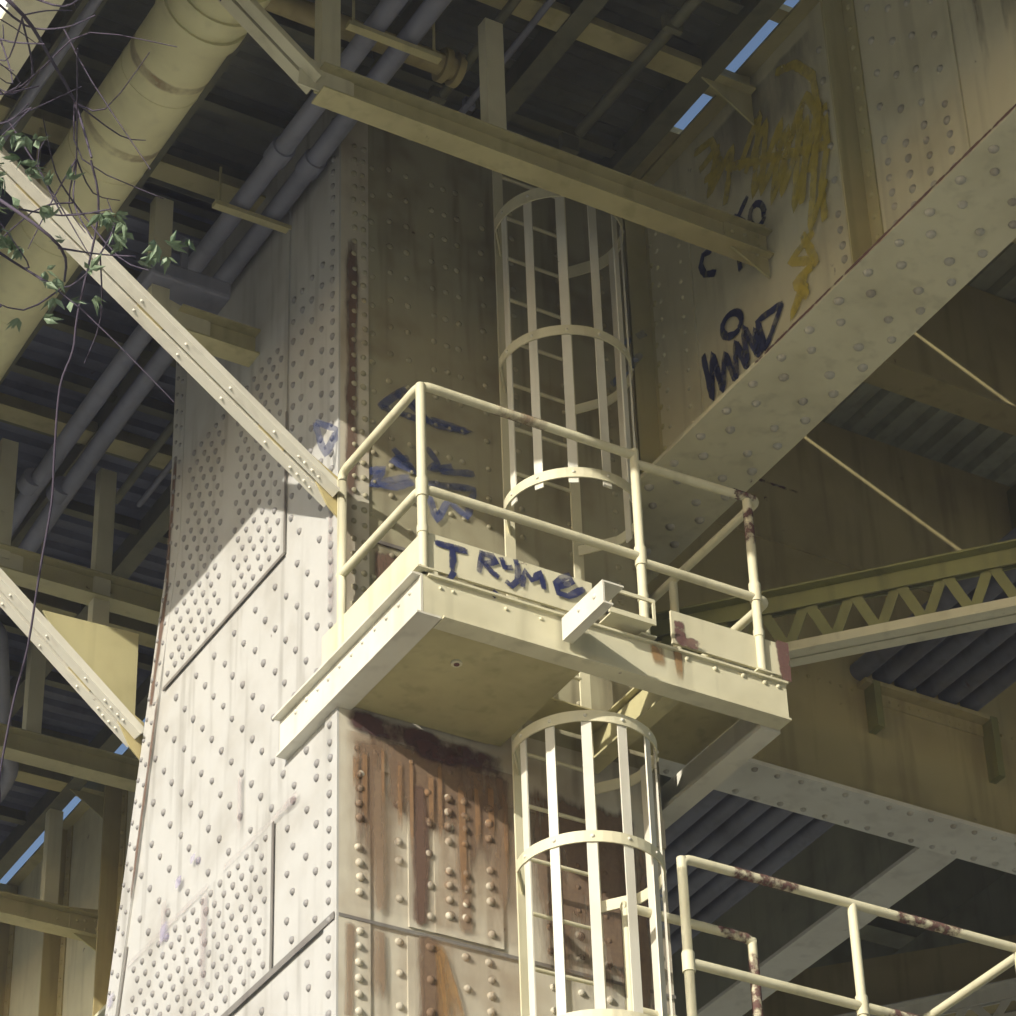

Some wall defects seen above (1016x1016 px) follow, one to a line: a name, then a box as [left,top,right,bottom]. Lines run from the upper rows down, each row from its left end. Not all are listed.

rust [346,245,358,494]
rust [375,552,397,580]
rust [651,620,699,674]
rust [353,739,508,931]
rust [729,866,798,893]
rust [346,923,355,1016]
rust [418,937,464,1016]